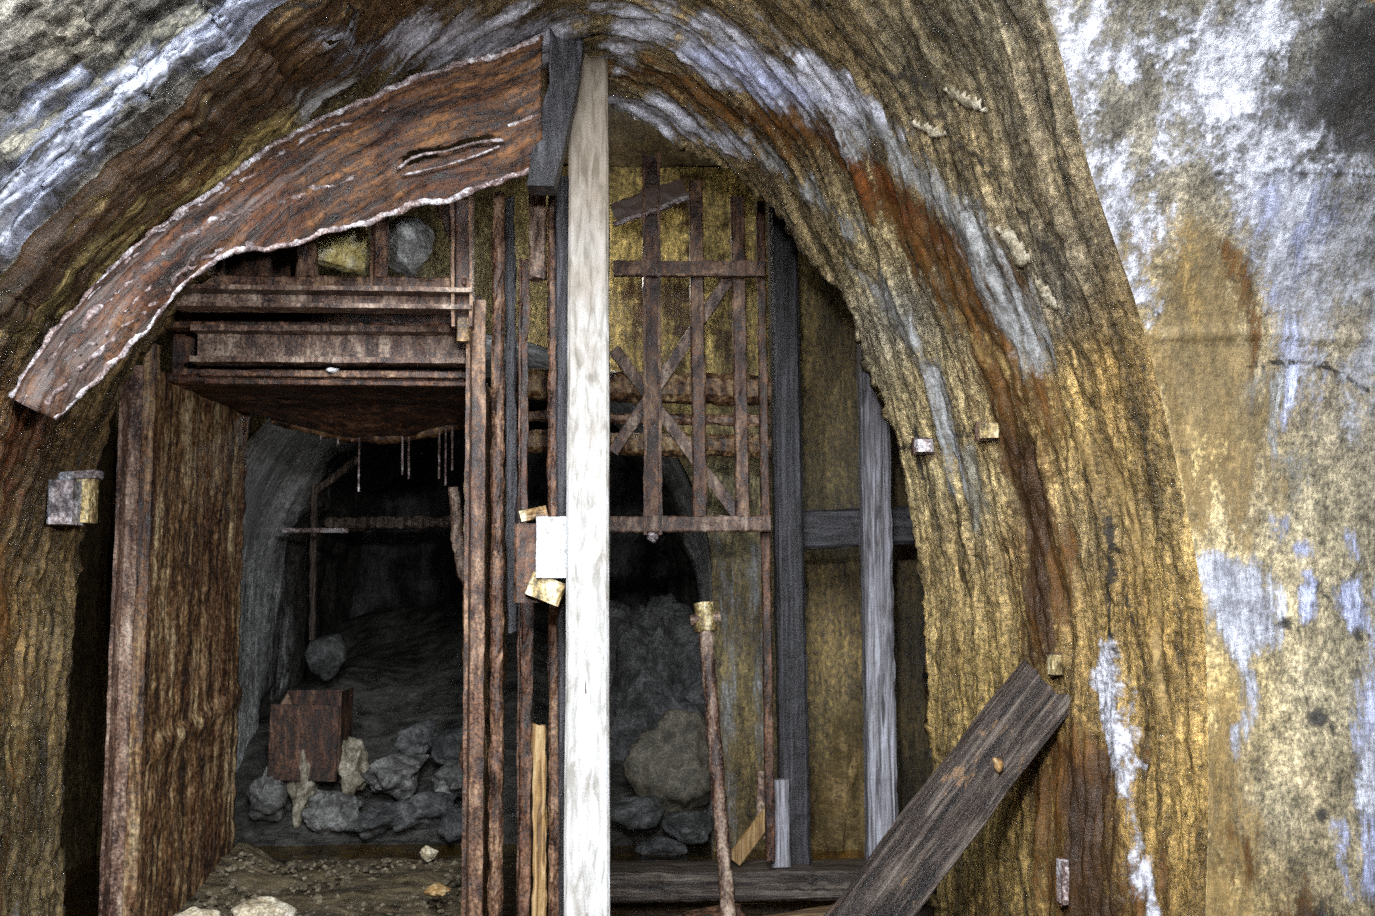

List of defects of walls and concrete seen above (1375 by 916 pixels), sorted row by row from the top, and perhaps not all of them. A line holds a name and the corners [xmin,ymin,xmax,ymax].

rust [608,52,1078,671]
water stain [1050,0,1375,491]
crack [1246,359,1370,392]
water stain [1092,640,1161,916]
water stain [1196,515,1316,756]
water stain [1332,579,1375,899]